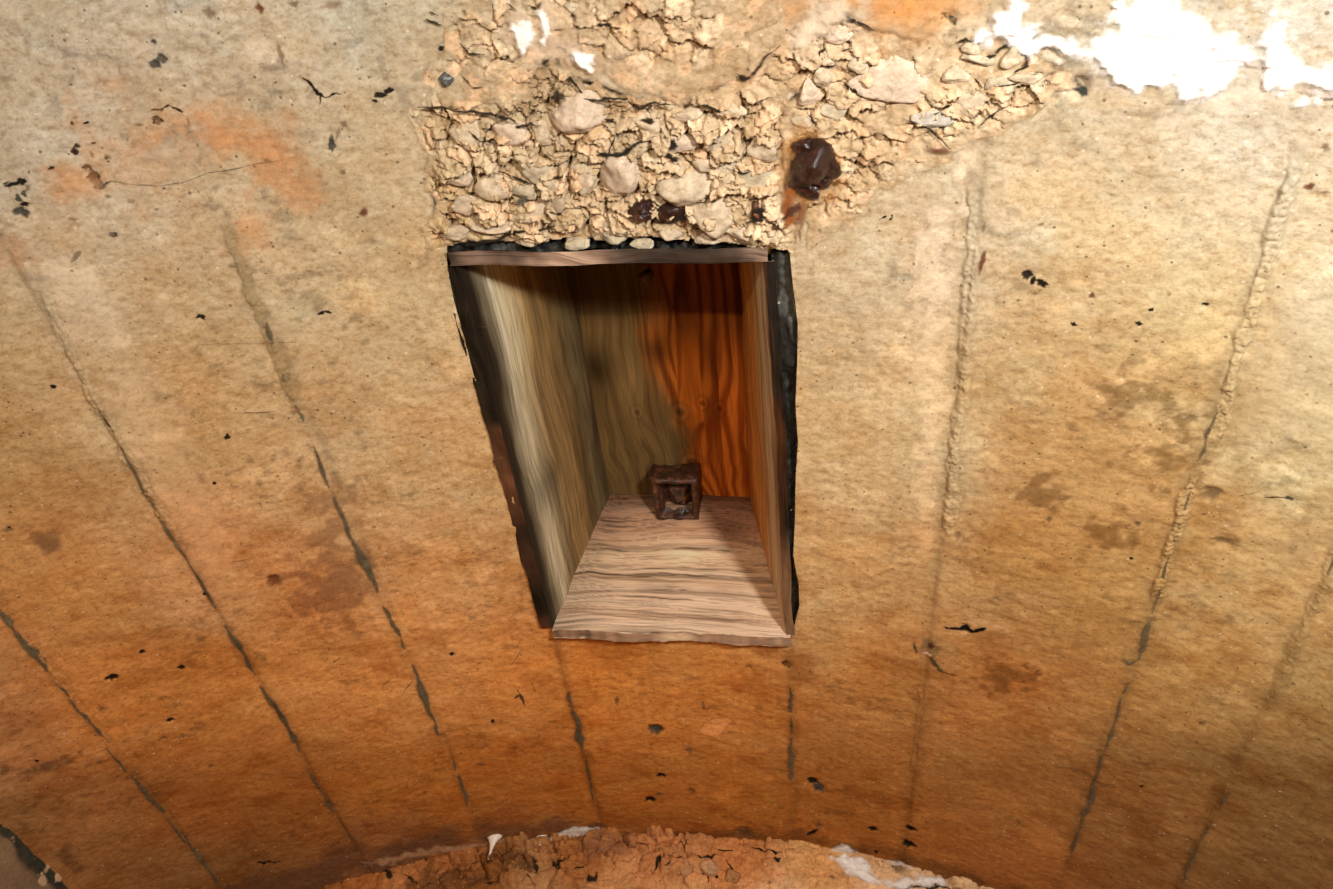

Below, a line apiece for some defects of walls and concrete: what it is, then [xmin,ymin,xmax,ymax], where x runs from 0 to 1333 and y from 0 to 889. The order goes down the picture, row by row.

water stain [973,0,1333,107]
crack [243,323,293,344]
spalling [407,0,1078,569]
crack [1200,406,1221,459]
crack [0,612,219,884]
crack [99,412,357,843]
crack [247,375,469,808]
spalling [807,777,824,792]
crack [1071,494,1190,856]
crack [1179,792,1230,889]